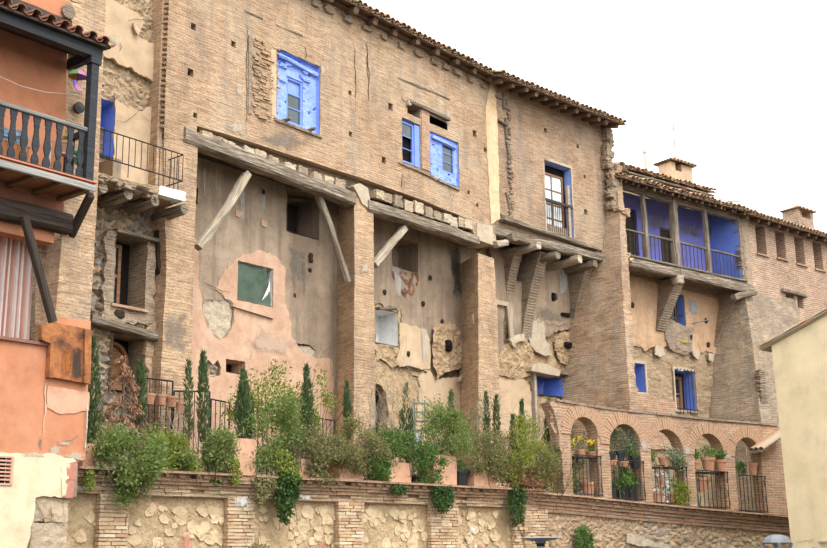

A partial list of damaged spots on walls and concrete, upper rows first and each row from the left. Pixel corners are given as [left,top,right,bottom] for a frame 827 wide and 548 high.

flaking render [132,19,145,36]
crack [353,42,370,100]
spalling [203,299,232,339]
rust [61,349,82,377]
flaking render [507,333,524,346]
flaking render [654,346,665,358]
flaking render [692,342,714,362]
flaking render [25,402,88,496]